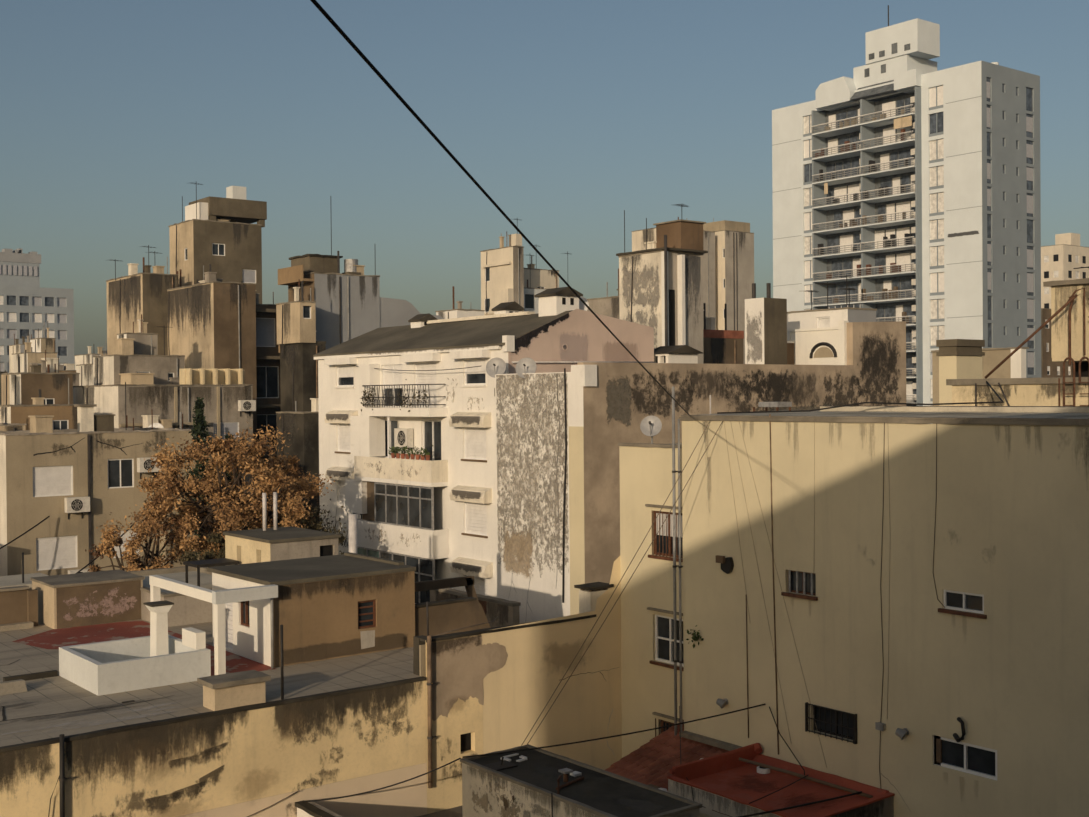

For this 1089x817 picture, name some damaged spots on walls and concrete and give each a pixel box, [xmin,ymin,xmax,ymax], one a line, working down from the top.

water stain [612,229,660,349]
water stain [606,313,901,426]
peeling [496,373,569,574]
peeling [63,587,137,621]
water stain [275,682,422,744]
spalling [432,636,508,721]
water stain [0,744,53,785]
water stain [65,711,247,817]
peeling [472,782,523,817]